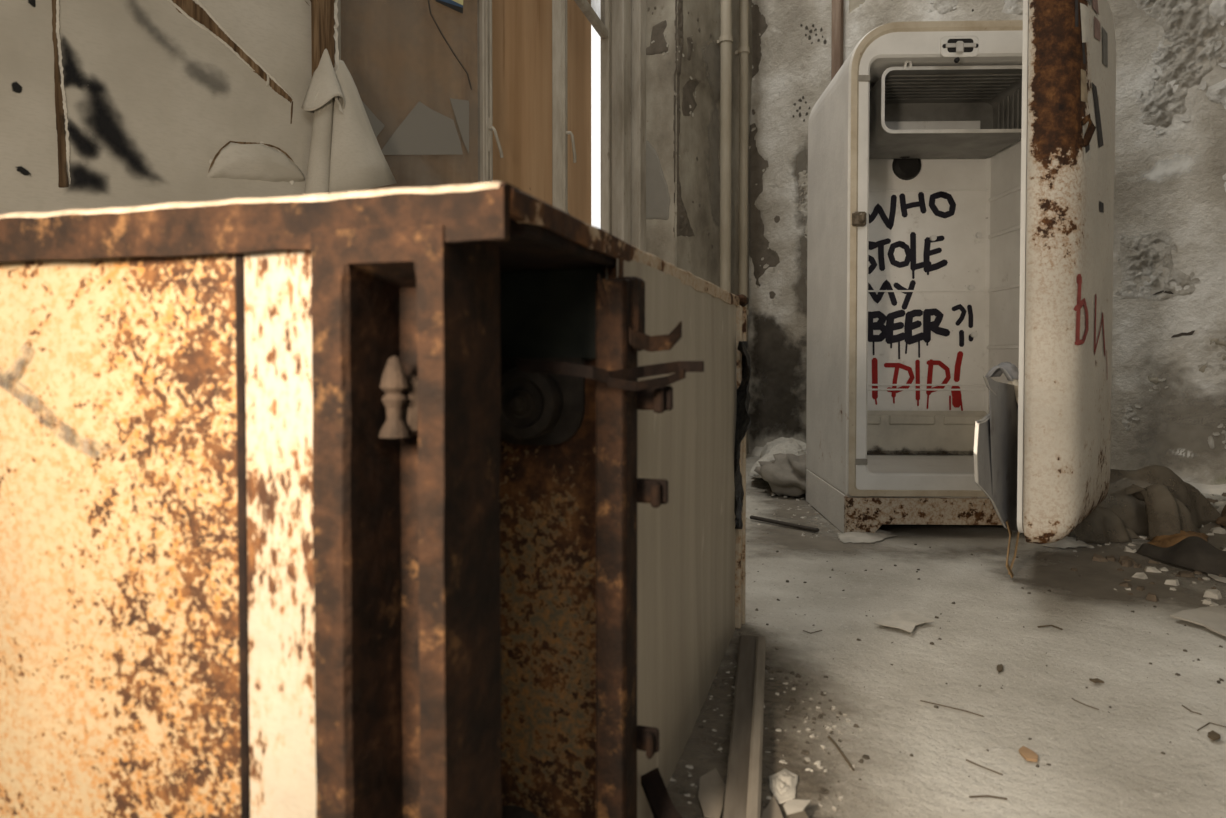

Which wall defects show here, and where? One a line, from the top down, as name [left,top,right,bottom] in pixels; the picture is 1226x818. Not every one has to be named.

water stain [749,313,807,439]